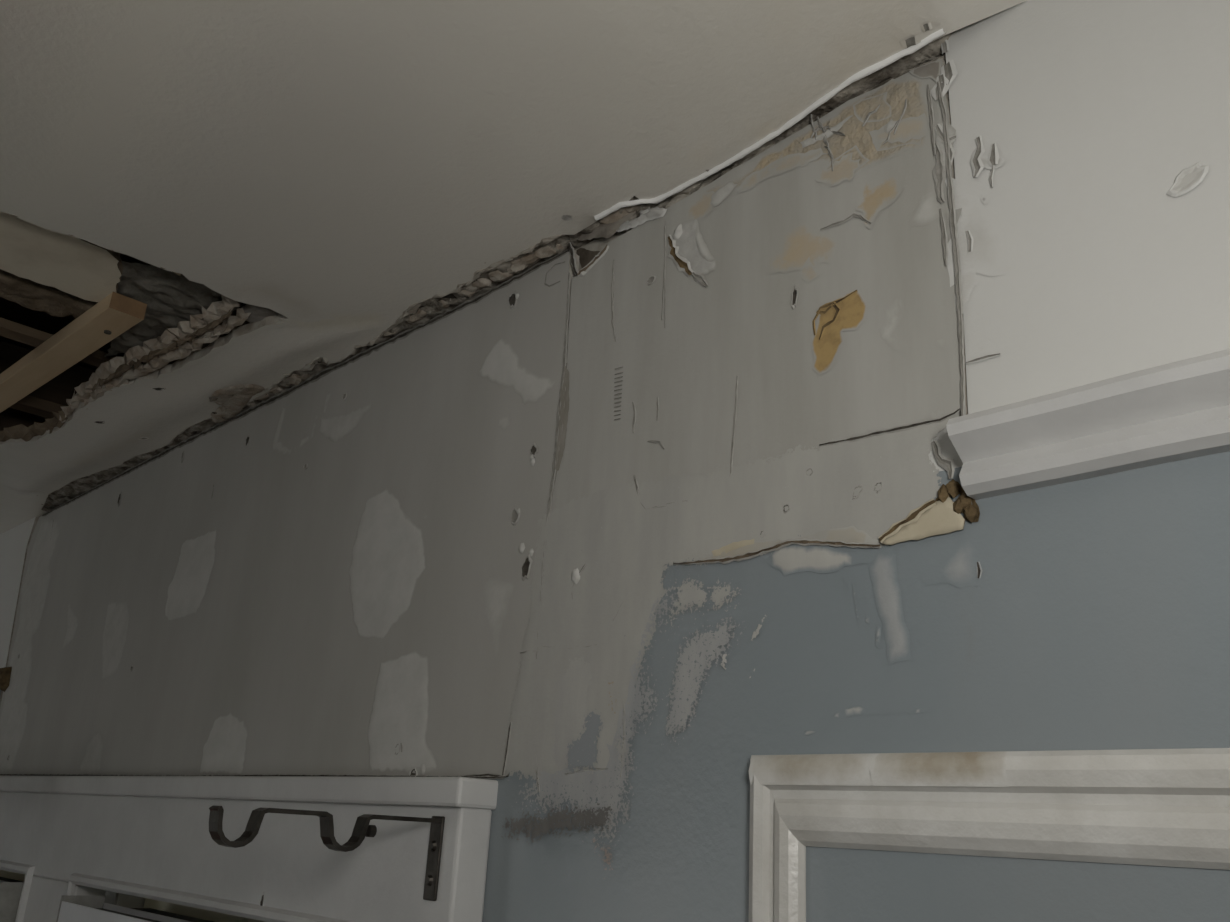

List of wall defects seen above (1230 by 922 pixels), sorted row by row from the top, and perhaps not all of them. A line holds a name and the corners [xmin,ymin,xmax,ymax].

flaking render [0,28,958,517]
crack [536,273,586,659]
flaking render [503,410,980,783]
leakage [811,288,867,375]
crack [819,81,1001,479]